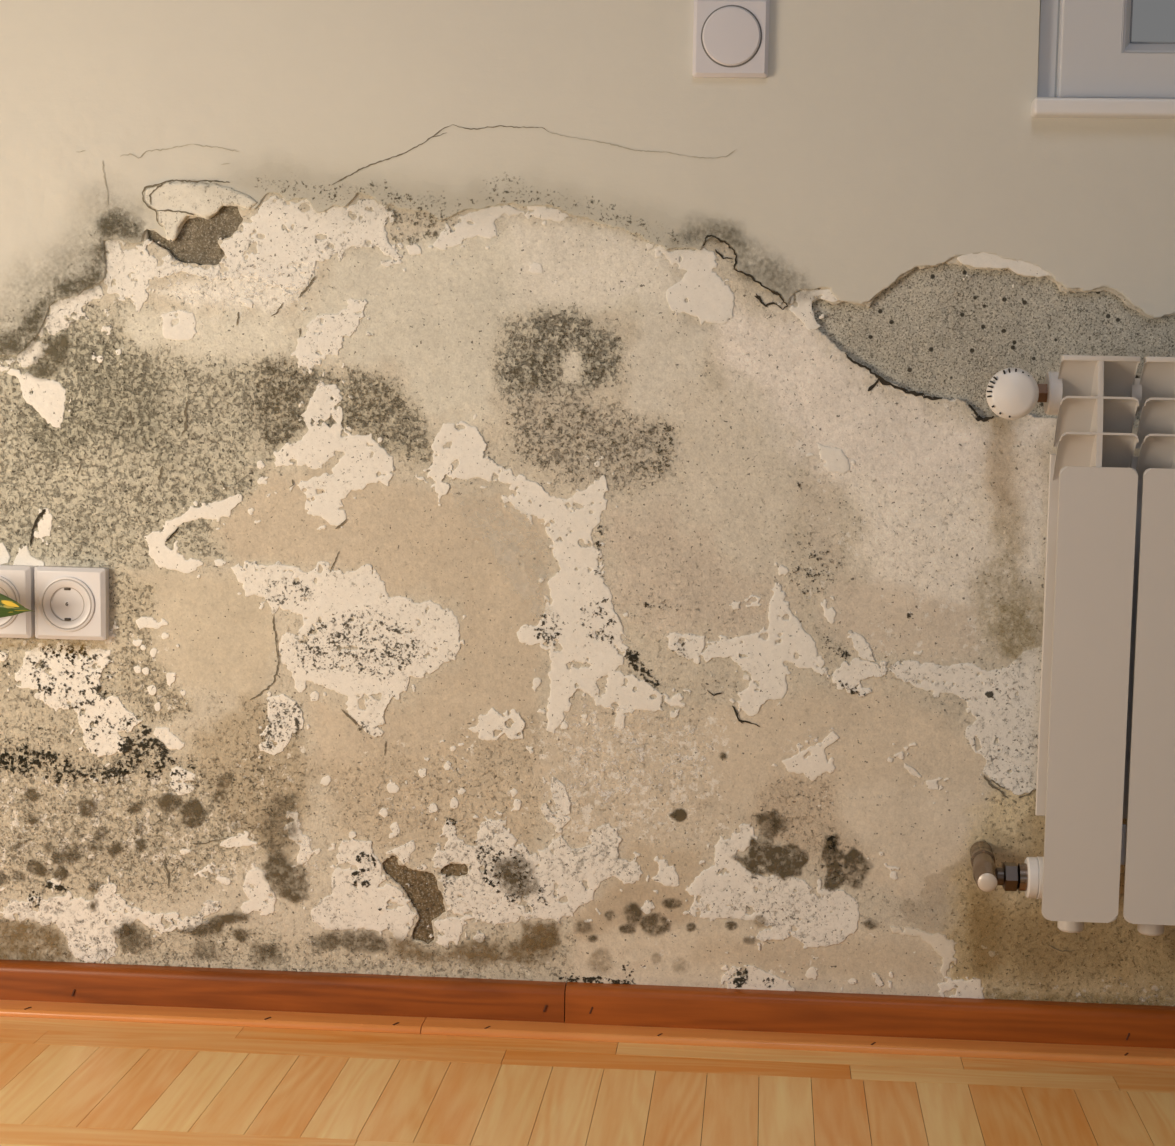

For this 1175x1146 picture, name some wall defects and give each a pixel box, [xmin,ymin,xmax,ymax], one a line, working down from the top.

crack [332,124,735,185]
damp [506,315,678,482]
flaking render [0,182,1175,1006]
damp [286,606,420,679]
damp [0,644,319,909]
damp [669,809,687,821]
damp [345,852,376,888]
damp [474,841,547,907]
damp [735,813,867,891]
damp [114,914,255,968]
damp [605,899,680,934]
damp [733,968,748,988]